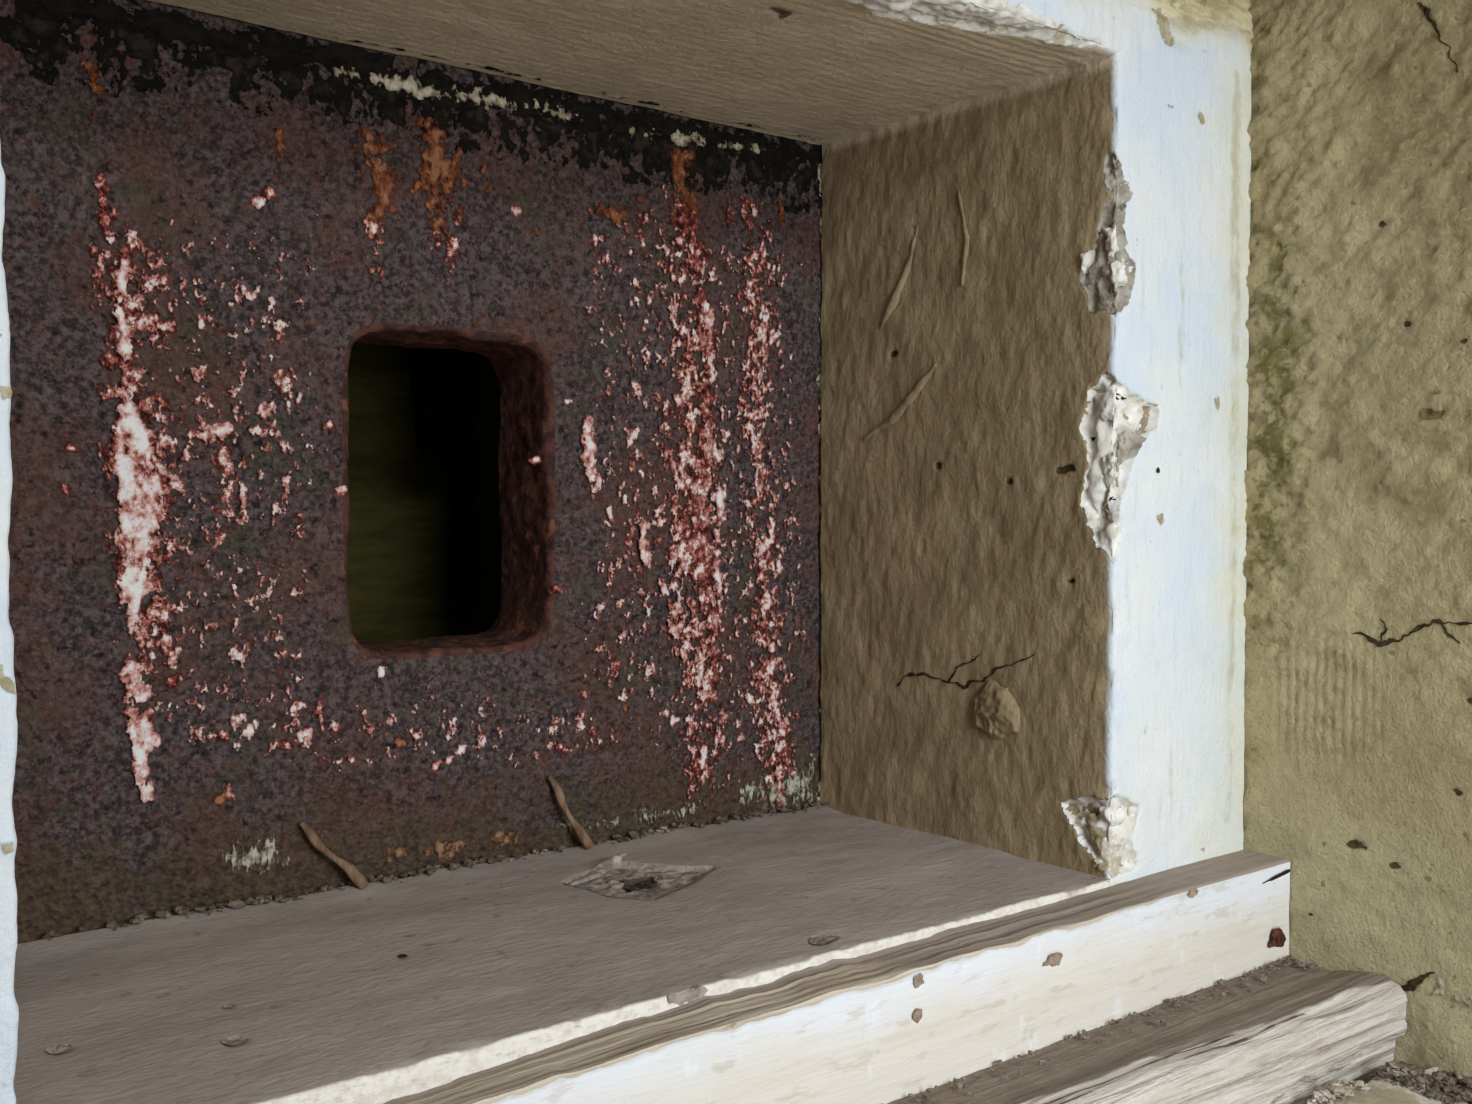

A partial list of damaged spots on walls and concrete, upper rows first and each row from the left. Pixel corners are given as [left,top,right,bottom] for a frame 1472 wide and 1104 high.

flaking render [840,0,1103,49]
peeling [0,0,823,254]
flaking render [1080,153,1136,315]
corrosion [89,170,188,803]
corrosion [195,401,248,555]
corrosion [580,414,602,499]
corrosion [588,147,799,809]
flaking render [1056,374,1159,564]
crack [897,653,1036,690]
crack [1353,619,1472,647]
flaking render [1061,795,1140,877]
crack [1401,972,1435,991]